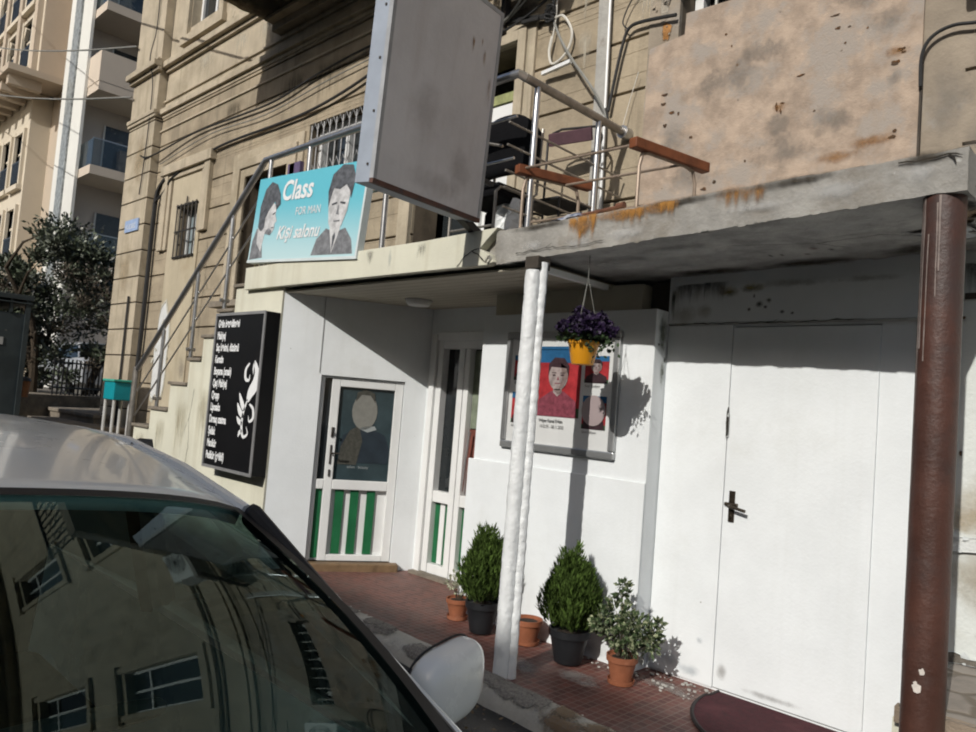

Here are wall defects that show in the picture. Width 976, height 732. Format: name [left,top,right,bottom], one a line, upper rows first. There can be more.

corrosion [662,22,673,41]
corrosion [569,200,675,239]
water stain [769,254,846,266]
water stain [665,267,771,311]
peeling [953,536,976,554]